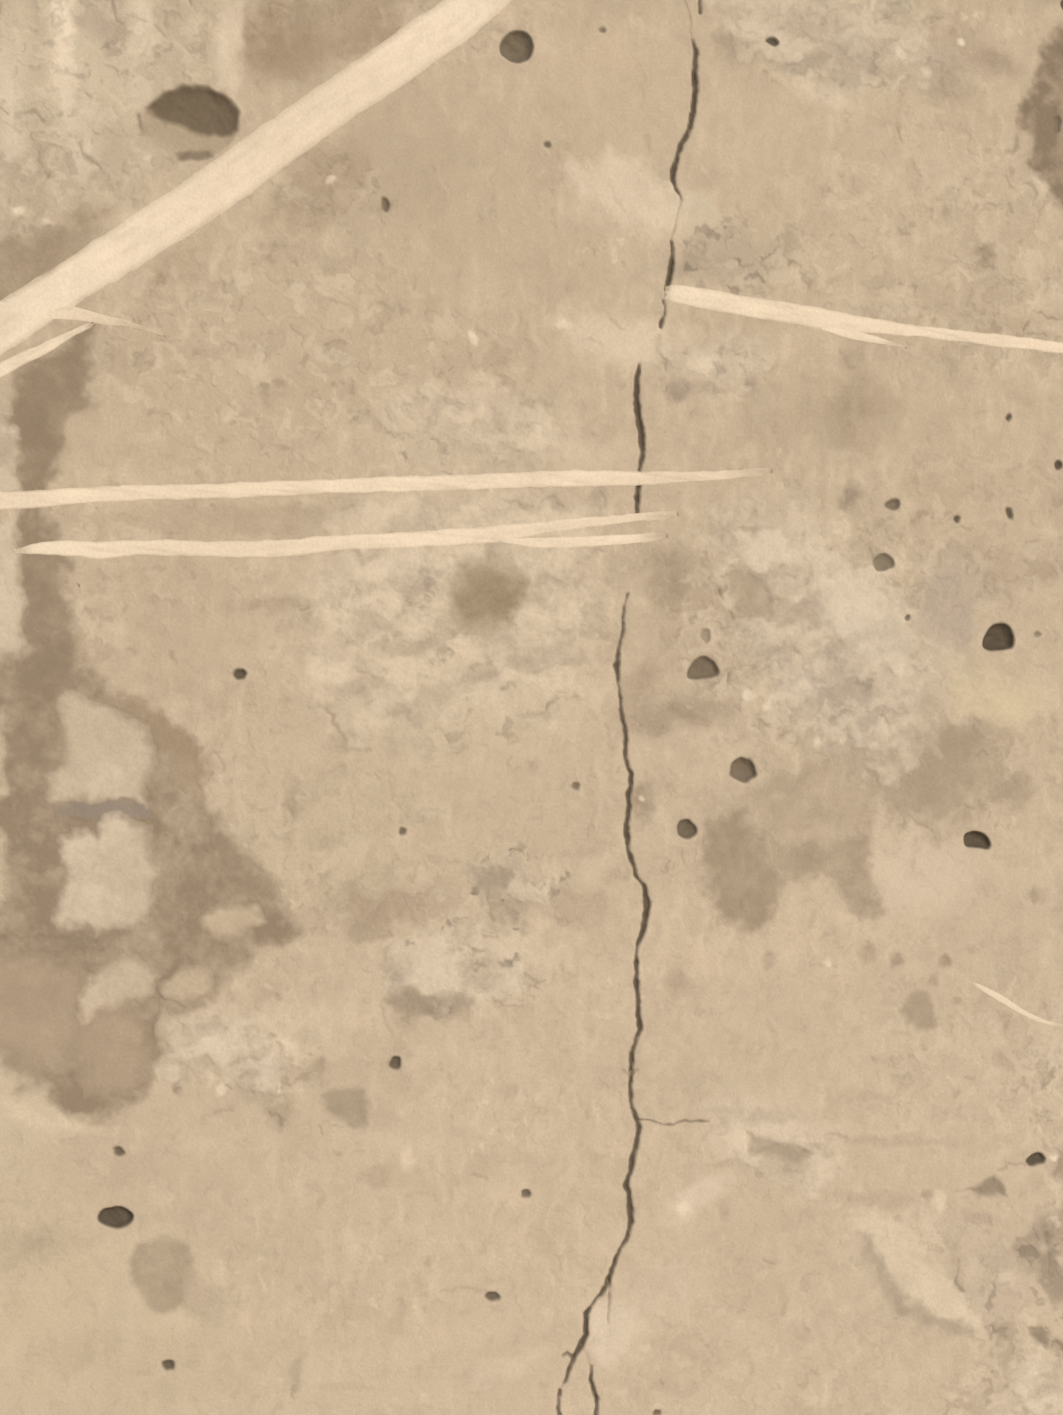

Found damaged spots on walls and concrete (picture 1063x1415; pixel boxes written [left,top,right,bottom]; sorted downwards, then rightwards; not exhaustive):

crack [658,0,704,330]
water stain [1009,18,1063,211]
water stain [0,321,106,491]
crack [632,362,648,514]
water stain [0,507,309,1131]
crack [555,591,711,1415]